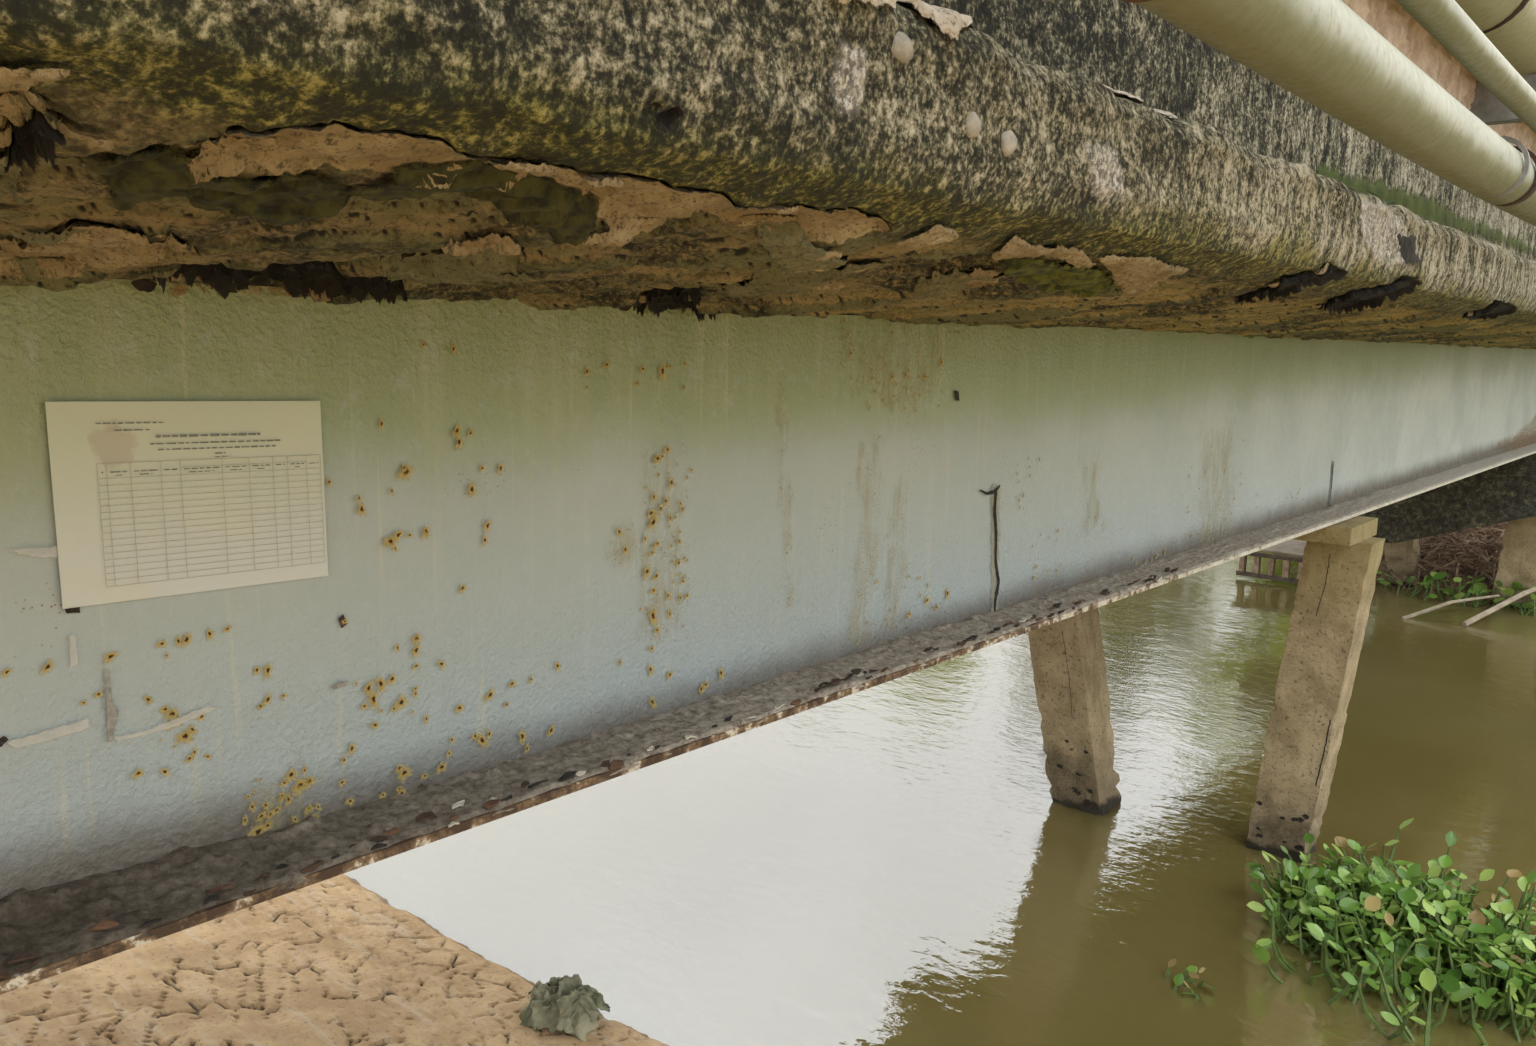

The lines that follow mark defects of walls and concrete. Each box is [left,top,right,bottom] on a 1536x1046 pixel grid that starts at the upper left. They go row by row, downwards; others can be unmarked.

water stain [834,47,865,113]
spalling [0,67,530,305]
spalling [183,121,959,322]
flaking render [1000,130,1017,157]
peeling [912,236,1189,300]
water stain [1086,145,1124,200]
spalling [1234,262,1424,316]
water stain [1360,201,1421,266]
corrosion [612,446,693,679]
corrosion [849,527,1178,663]
corrosion [355,634,429,729]
corrosion [203,744,660,906]